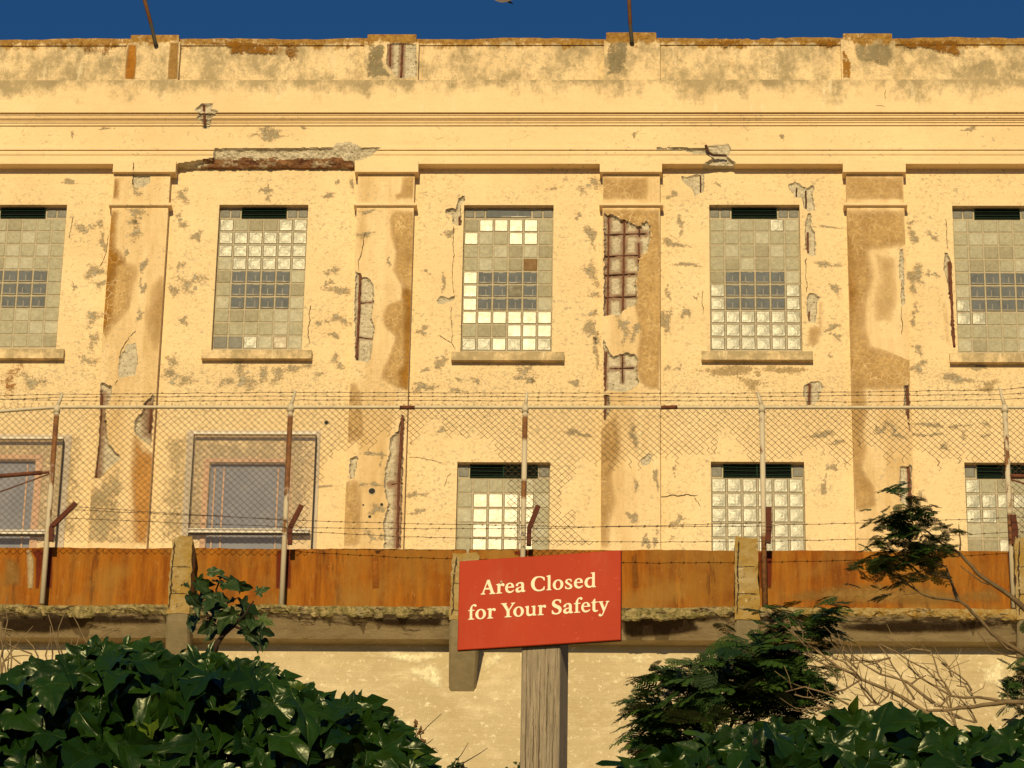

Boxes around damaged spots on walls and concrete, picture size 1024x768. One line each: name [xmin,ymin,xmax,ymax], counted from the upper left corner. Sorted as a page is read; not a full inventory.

water stain [168,43,178,79]
spalling [94,343,138,478]
water stain [103,252,135,336]
spalling [134,394,154,445]
spalling [177,126,381,198]
spalling [316,266,375,369]
spalling [349,415,429,549]
water stain [384,211,413,388]
spalling [574,212,691,421]
spalling [788,181,842,268]
water stain [847,212,910,509]
spalling [899,219,956,348]